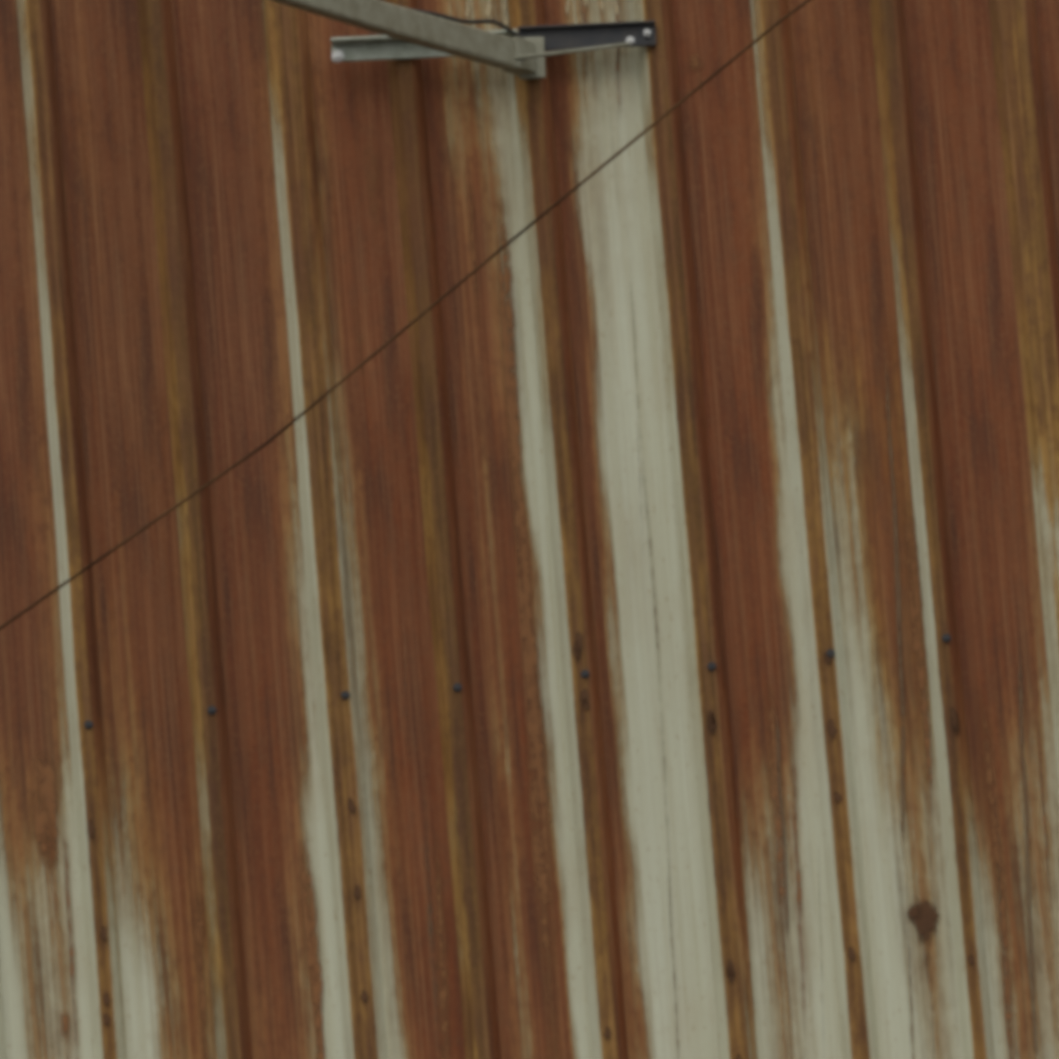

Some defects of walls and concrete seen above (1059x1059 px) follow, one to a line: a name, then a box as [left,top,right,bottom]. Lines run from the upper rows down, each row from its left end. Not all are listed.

rust [0,0,651,1059]
rust [642,0,1059,1059]